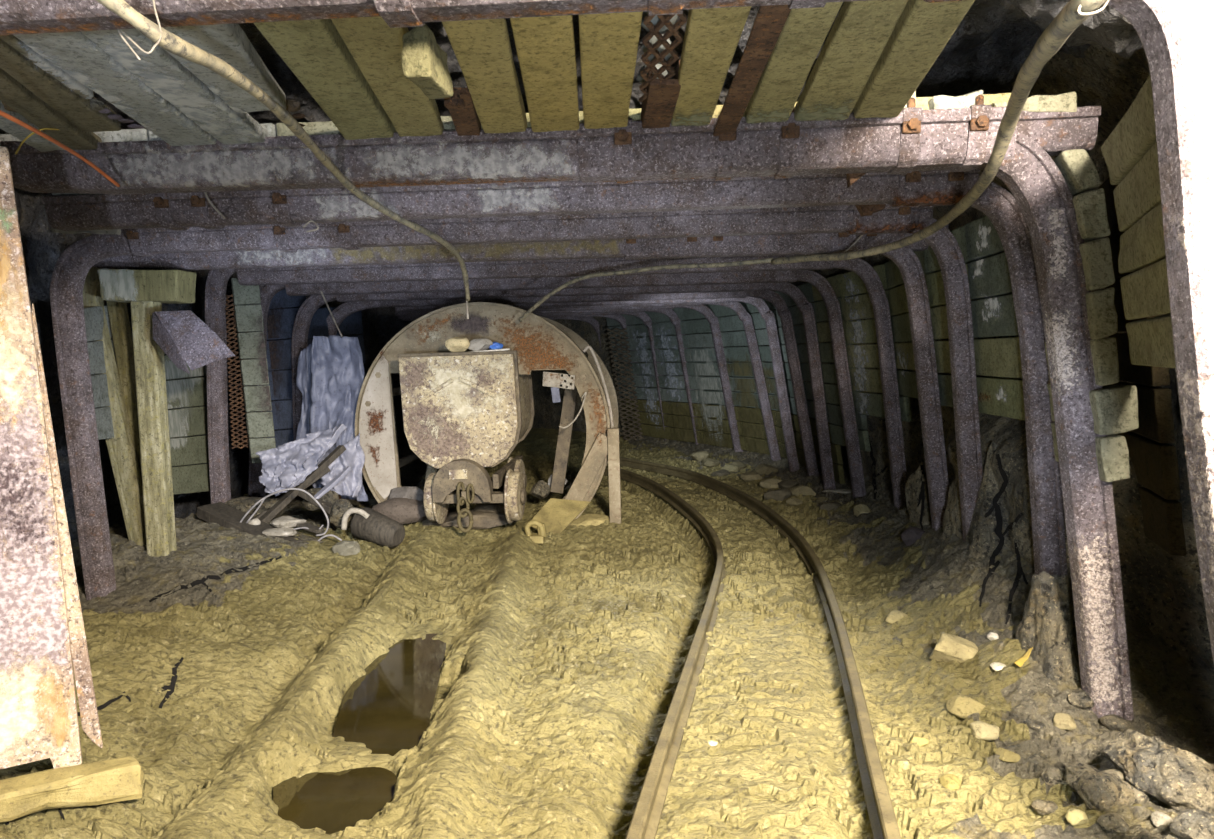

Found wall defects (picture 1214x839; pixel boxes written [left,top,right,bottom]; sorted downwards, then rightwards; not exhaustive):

crack [979,454,1028,625]